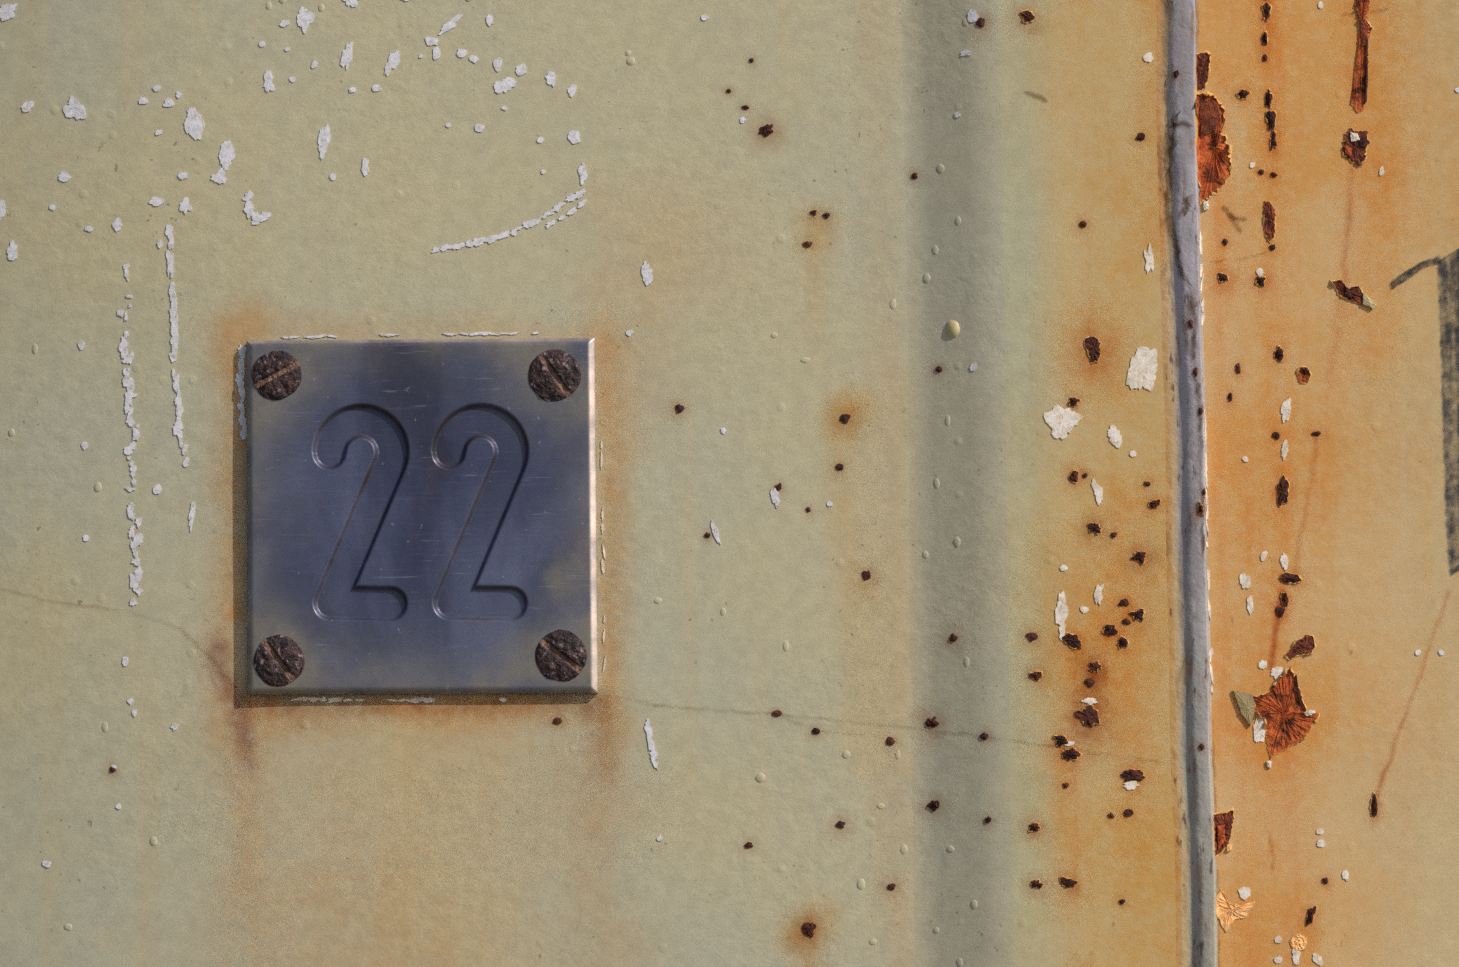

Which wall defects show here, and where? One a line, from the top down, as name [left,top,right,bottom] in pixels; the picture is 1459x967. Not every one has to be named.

peeling [279,6,315,34]
peeling [419,0,527,111]
peeling [139,85,205,141]
peeling [211,140,235,184]
peeling [242,190,271,225]
peeling [149,172,192,467]
peeling [235,345,247,440]
peeling [117,264,162,606]
peeling [1233,634,1320,768]
peeling [1213,808,1234,859]
peeling [1216,887,1255,933]
peeling [1274,905,1323,966]